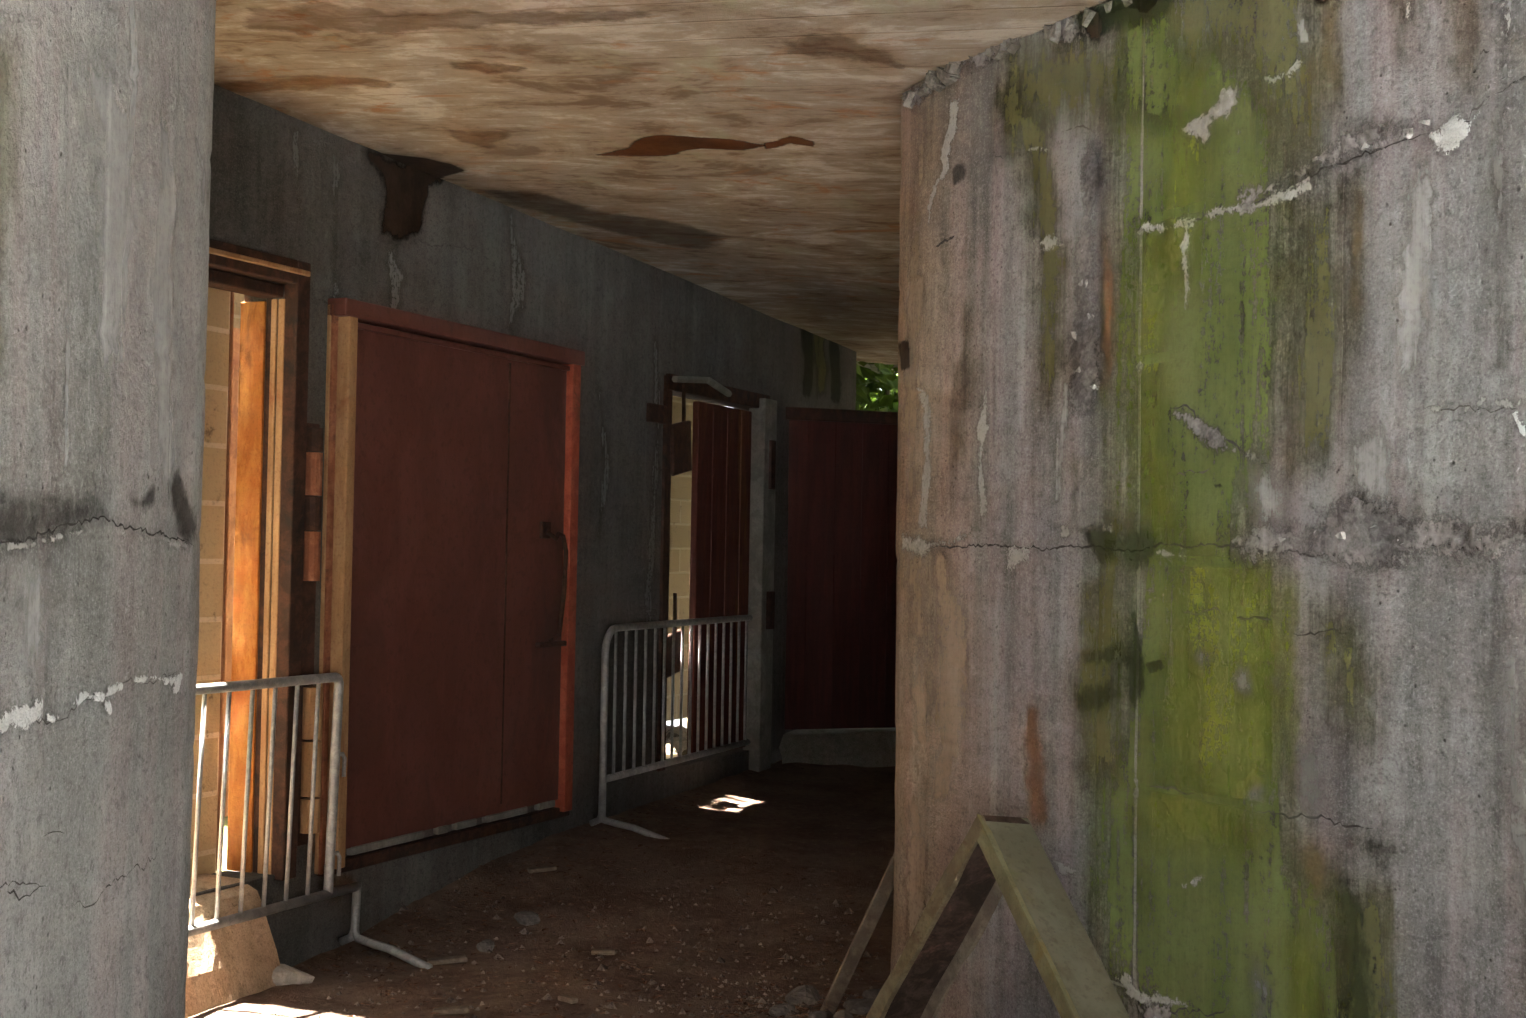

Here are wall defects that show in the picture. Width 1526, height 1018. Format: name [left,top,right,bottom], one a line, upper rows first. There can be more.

water stain [367,149,464,309]
water stain [597,135,815,156]
spalling [1182,86,1238,144]
crack [1141,76,1526,309]
spalling [1398,171,1431,368]
spalling [1429,111,1480,155]
water stain [952,352,989,517]
crack [0,516,195,551]
crack [901,533,1324,558]
crack [0,666,187,734]
water stain [905,551,967,936]
water stain [1292,877,1397,1018]